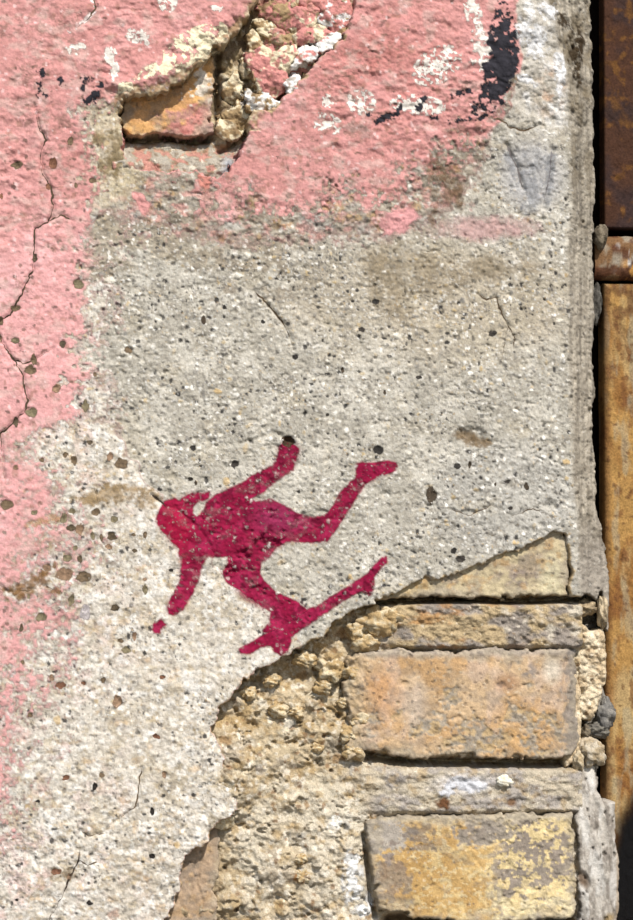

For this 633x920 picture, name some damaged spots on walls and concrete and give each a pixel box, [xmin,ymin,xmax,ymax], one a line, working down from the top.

spalling [65,0,492,267]
peeling [492,73,519,121]
spalling [24,353,37,374]
crack [0,110,73,478]
peeling [57,279,122,357]
peeling [0,369,583,920]
crack [49,770,142,920]